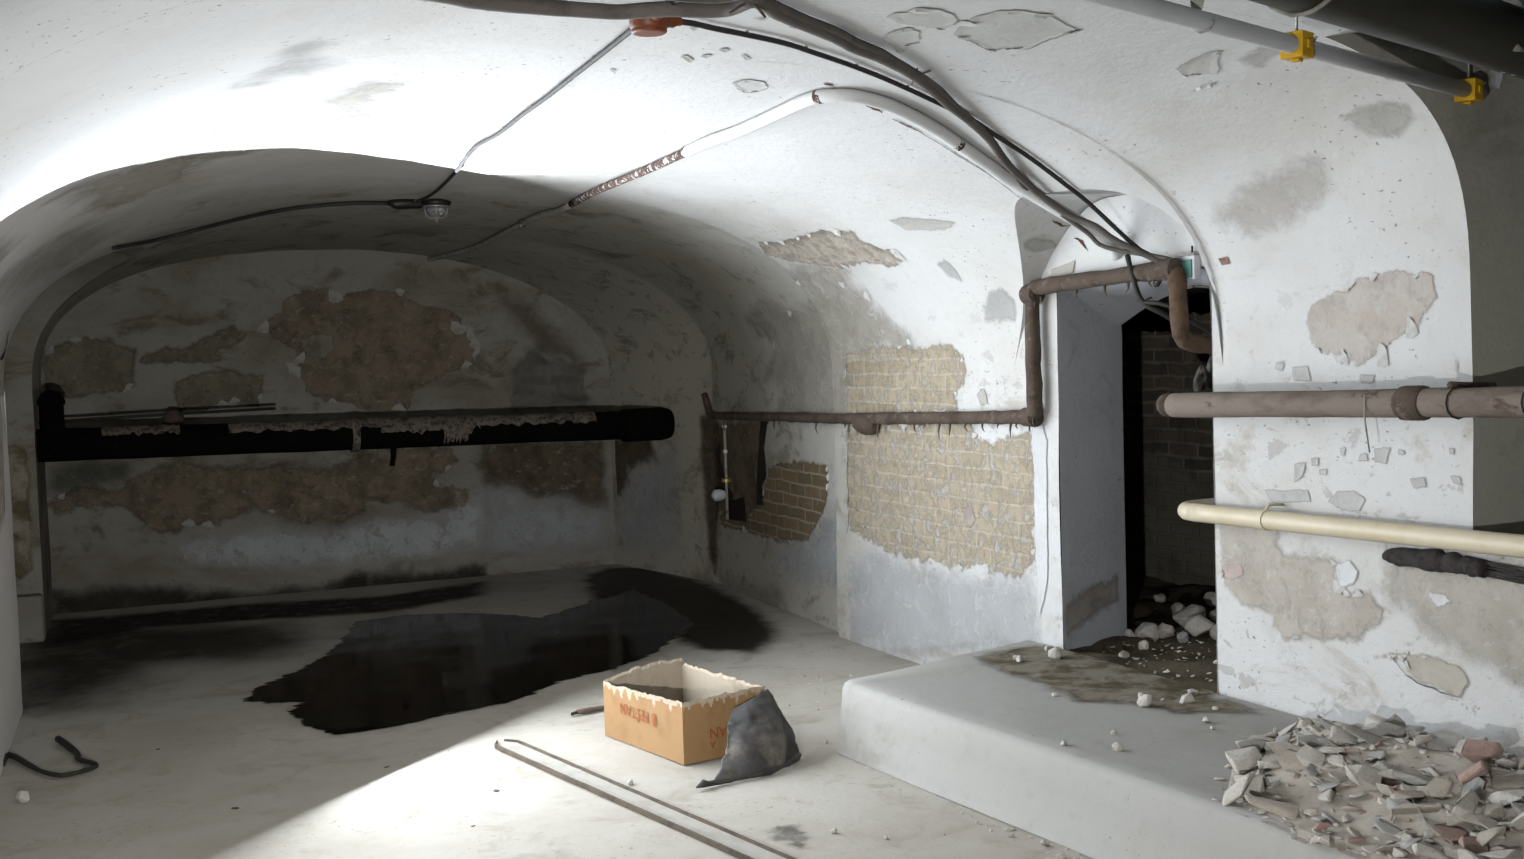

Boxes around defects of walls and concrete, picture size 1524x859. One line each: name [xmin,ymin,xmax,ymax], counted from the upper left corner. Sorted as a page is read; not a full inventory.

peeling [955,10,1082,53]
peeling [892,217,953,231]
peeling [1051,261,1075,276]
peeling [42,287,480,416]
peeling [1306,270,1437,383]
peeling [0,406,33,579]
peeling [47,447,468,533]
flaking render [716,228,1048,615]
peeling [1266,457,1327,503]
peeling [1340,448,1404,464]
spalling [1066,576,1119,635]
peeling [1219,524,1524,698]